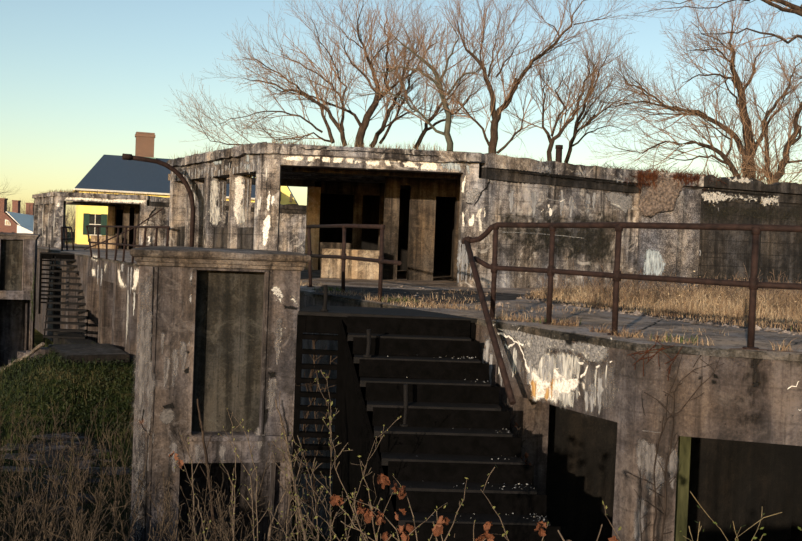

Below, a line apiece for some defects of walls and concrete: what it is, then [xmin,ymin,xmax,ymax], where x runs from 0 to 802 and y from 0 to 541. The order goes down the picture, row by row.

peeling [257,191,275,246]
peeling [457,240,472,283]
spalling [493,324,612,370]